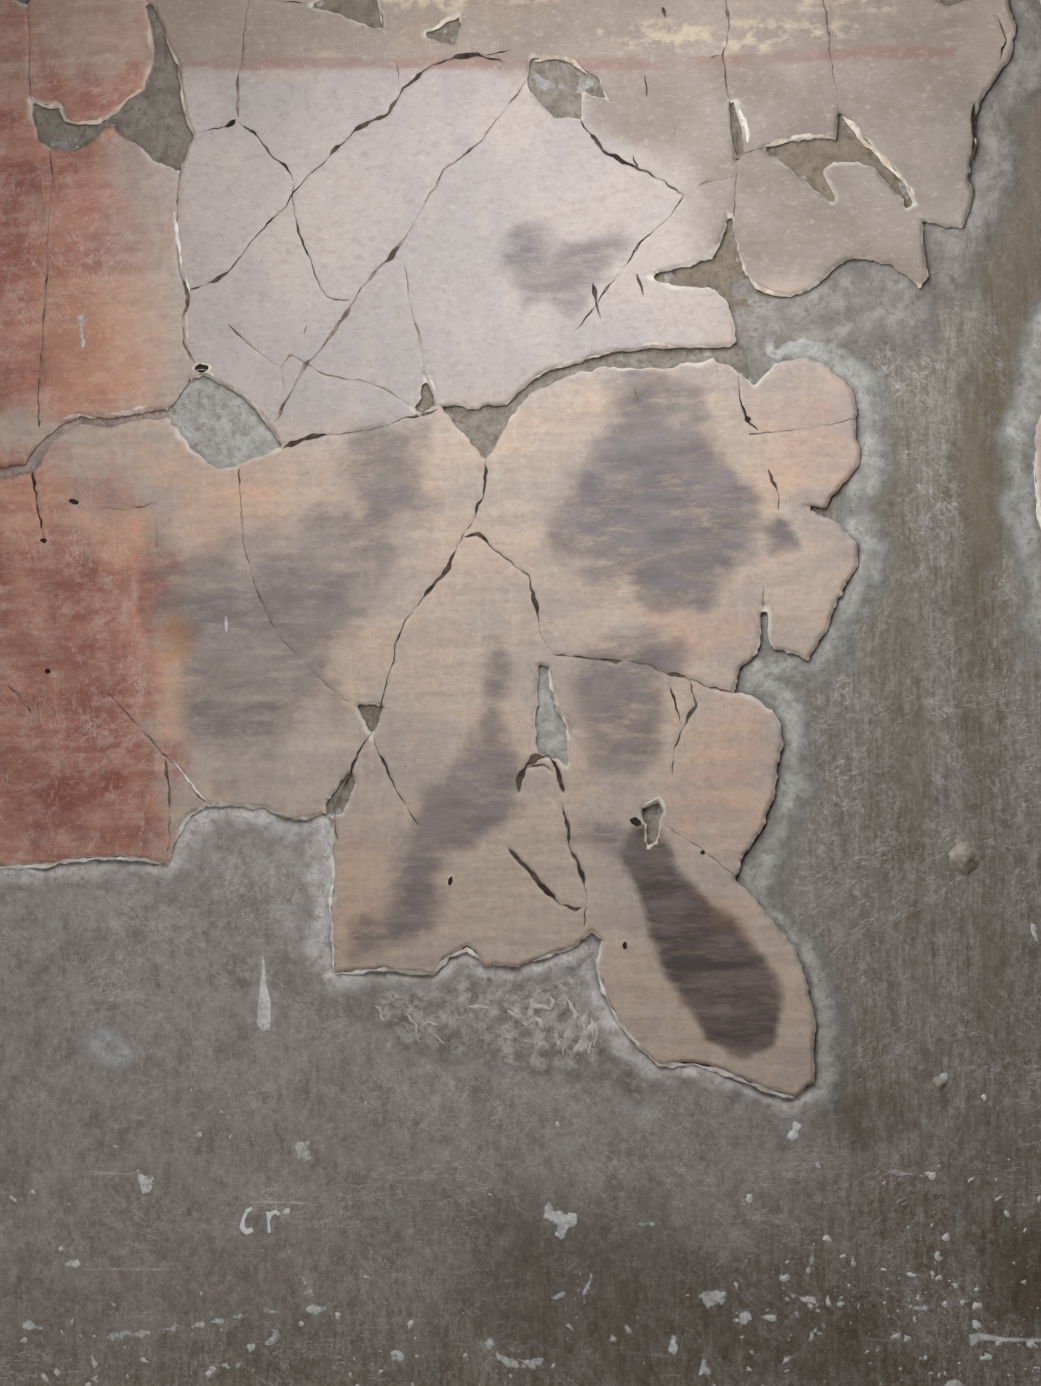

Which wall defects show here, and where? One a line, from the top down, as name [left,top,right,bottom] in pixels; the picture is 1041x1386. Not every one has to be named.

spalling [33,5,194,171]
crack [174,0,530,448]
spalling [528,55,605,119]
crack [574,0,763,331]
spalling [654,218,792,317]
spalling [764,115,916,208]
spalling [416,342,748,459]
water stain [567,425,754,602]
crack [238,465,732,839]
water stain [355,715,515,948]
crack [509,753,586,924]
water stain [624,826,778,1054]